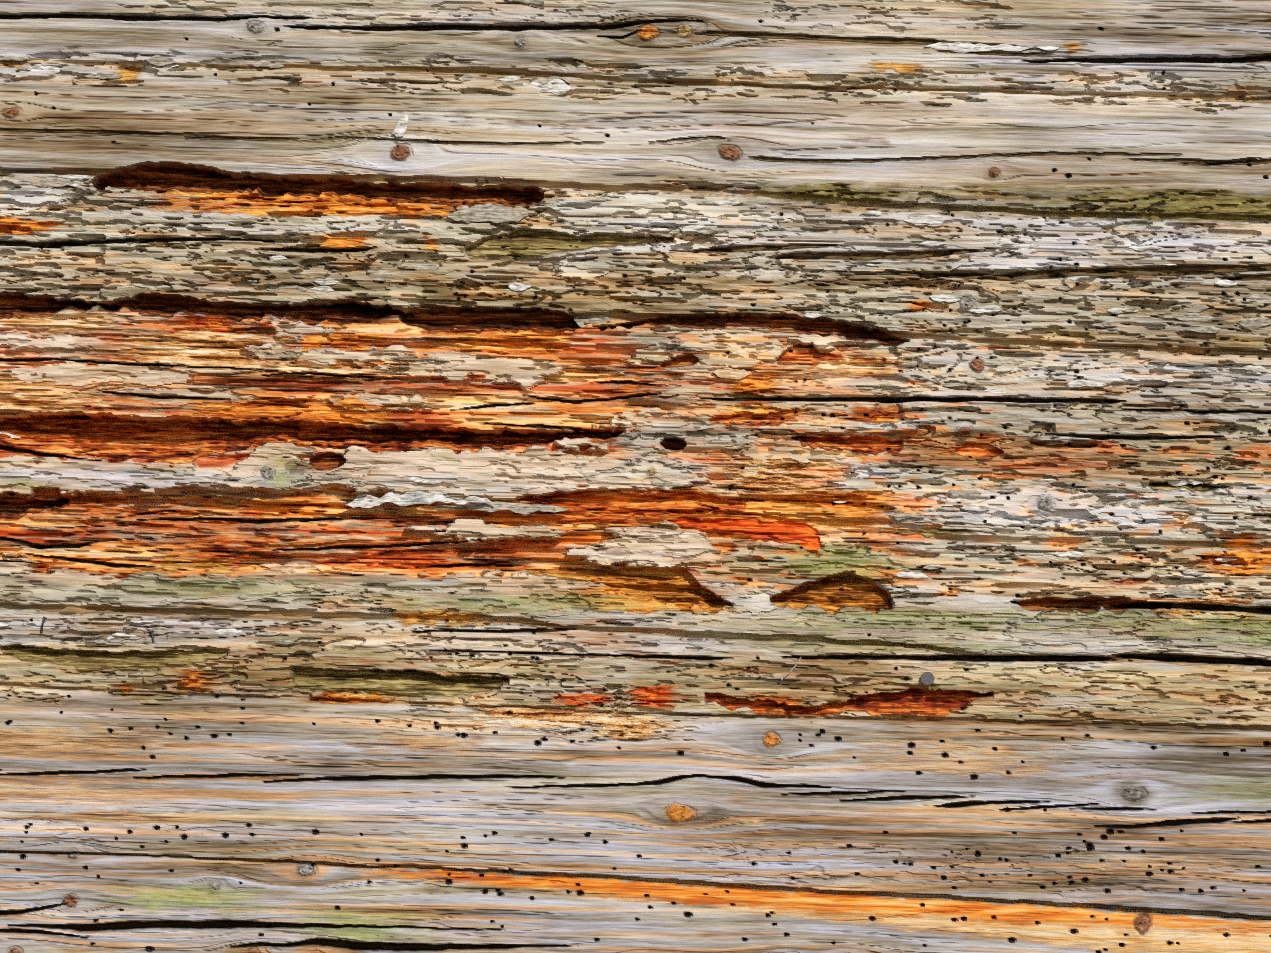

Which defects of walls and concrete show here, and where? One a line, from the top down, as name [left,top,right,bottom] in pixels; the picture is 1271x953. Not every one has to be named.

crack [0,14,1271,64]
peeling [0,165,796,284]
spalling [0,263,908,391]
spalling [0,407,903,615]
peeling [1091,479,1224,523]
spalling [1012,570,1216,614]
crack [1110,603,1271,614]
spalling [0,622,228,671]
spalling [294,667,508,697]
spalling [705,689,992,716]
crack [0,769,1271,829]
crack [0,903,568,951]